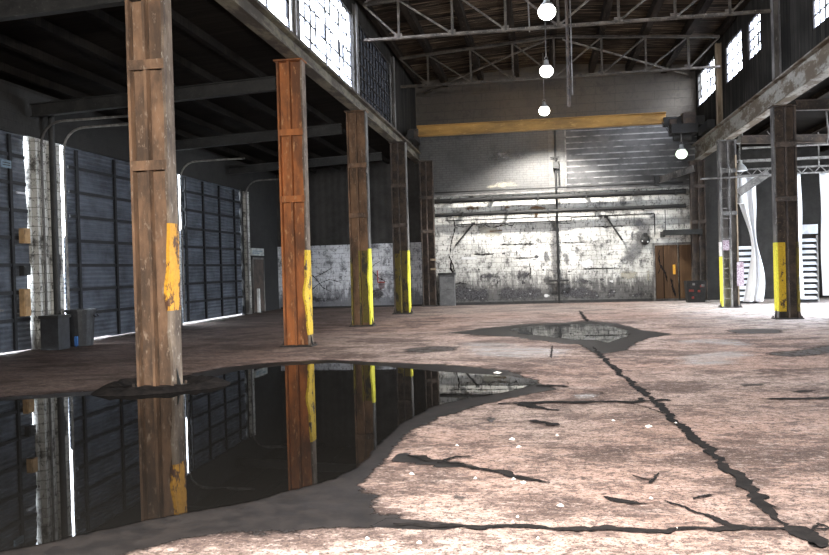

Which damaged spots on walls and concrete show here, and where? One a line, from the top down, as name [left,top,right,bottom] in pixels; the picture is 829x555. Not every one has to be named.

peeling [455,268,542,301]
peeling [560,279,616,298]
water stain [448,321,671,353]
water stain [0,359,556,555]
crack [393,346,829,547]